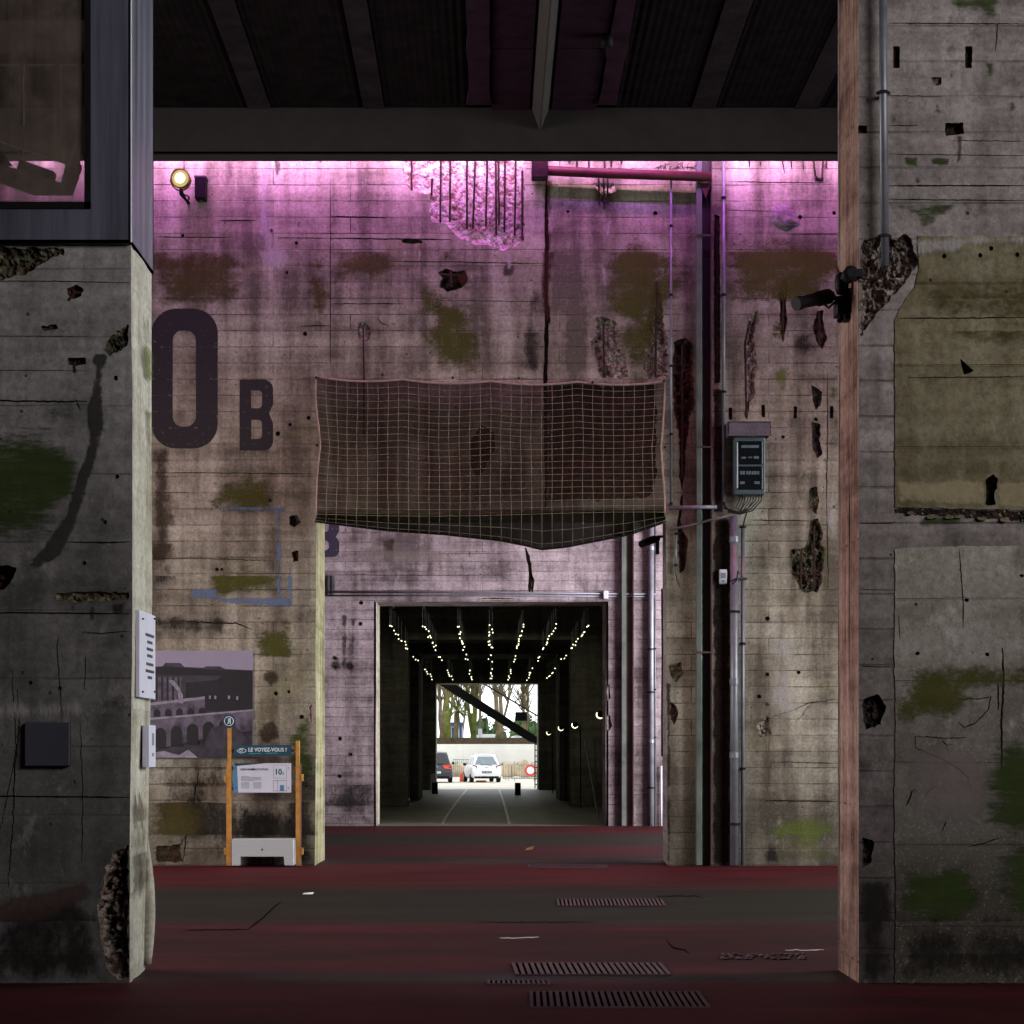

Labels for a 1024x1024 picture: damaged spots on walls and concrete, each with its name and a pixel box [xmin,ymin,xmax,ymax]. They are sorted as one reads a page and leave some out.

spalling [402,161,526,251]
crack [283,179,549,369]
spalling [438,269,468,292]
spalling [858,234,918,336]
crack [439,298,551,384]
spalling [590,317,629,379]
spalling [744,311,759,419]
spalling [638,281,695,573]
crack [360,548,535,592]
spalling [790,487,825,593]
crack [906,647,1005,805]
spalling [97,843,133,980]